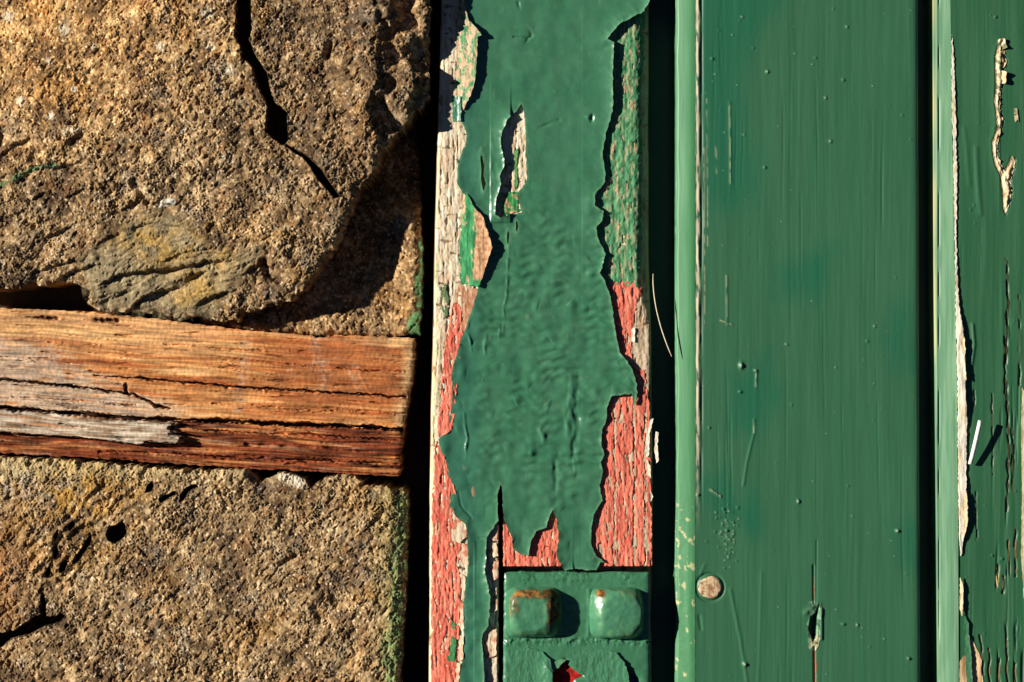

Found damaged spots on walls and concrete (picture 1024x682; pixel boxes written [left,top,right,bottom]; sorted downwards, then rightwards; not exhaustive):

crack [234,0,341,198]
peeling [992,38,1019,213]
crack [0,375,406,446]
peeling [82,0,527,682]
peeling [591,5,659,566]
peeling [951,38,982,556]
corrosion [513,589,559,624]
peeling [959,578,983,682]